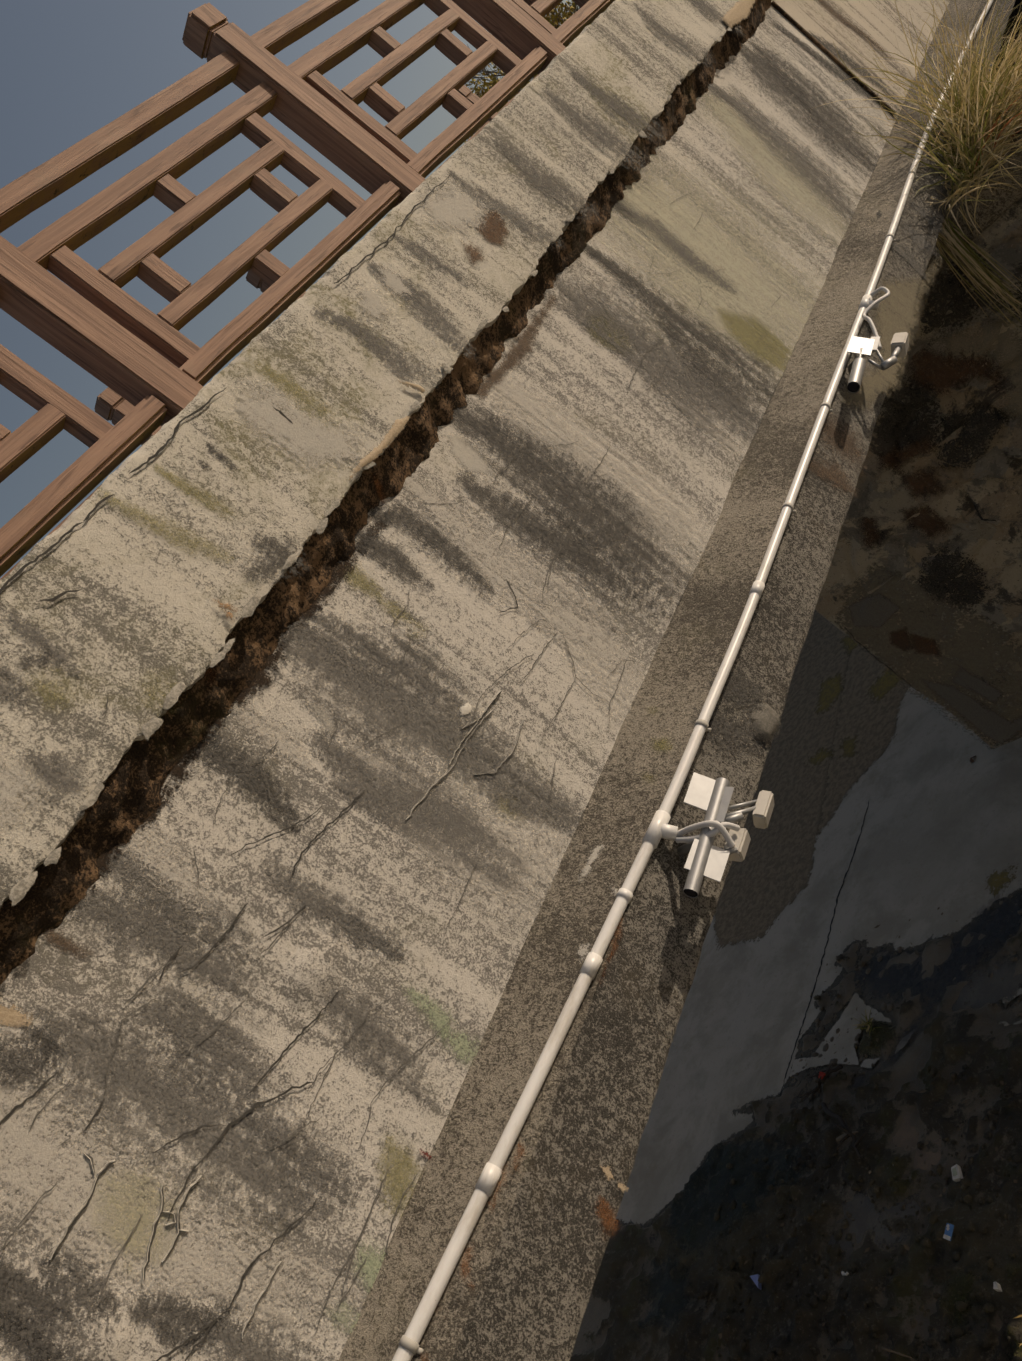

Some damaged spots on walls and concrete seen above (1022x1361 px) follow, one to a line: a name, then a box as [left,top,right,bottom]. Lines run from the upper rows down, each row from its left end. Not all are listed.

crack [0,388,226,602]
water stain [0,825,361,1361]
crack [0,741,365,1260]
crack [99,991,392,1302]
water stain [311,305,438,386]
water stain [189,608,584,920]
crack [332,175,450,284]
crack [405,489,637,820]
water stain [353,368,715,723]
peeling [580,845,604,882]
water stain [495,0,879,460]
water stain [693,669,768,760]